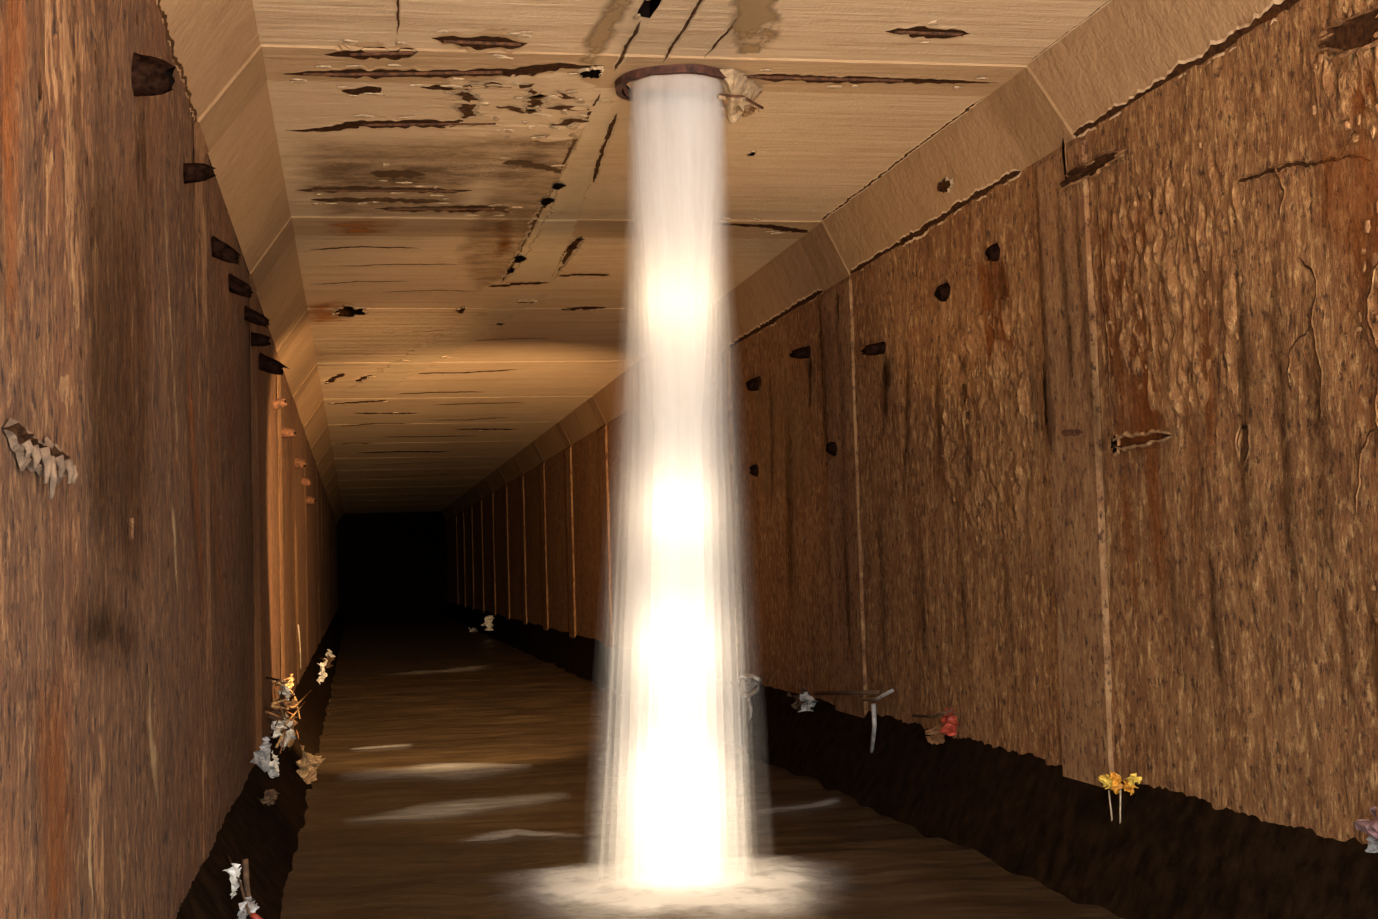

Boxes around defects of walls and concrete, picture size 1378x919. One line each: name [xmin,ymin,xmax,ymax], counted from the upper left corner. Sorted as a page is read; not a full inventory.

crack [394,0,402,34]
leakage [314,134,571,279]
crack [560,0,745,183]
leakage [731,0,779,53]
crack [729,169,1022,349]
crack [821,97,984,220]
peeling [1057,139,1246,457]
crack [1062,0,1300,403]
crack [1209,128,1373,219]
peeling [1300,0,1378,143]
peeling [1355,188,1378,363]